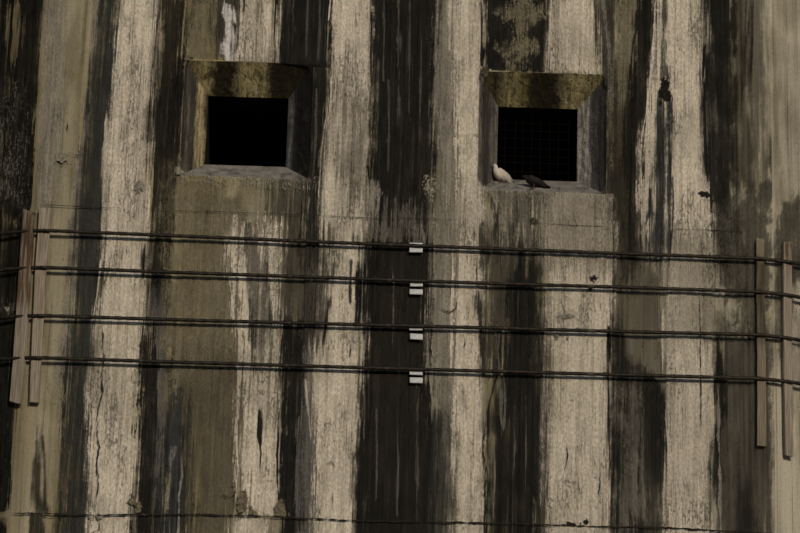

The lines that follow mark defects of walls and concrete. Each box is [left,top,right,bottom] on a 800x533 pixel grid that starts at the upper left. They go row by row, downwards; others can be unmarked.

water stain [0,0,68,533]
water stain [55,233,782,533]
water stain [71,0,800,377]